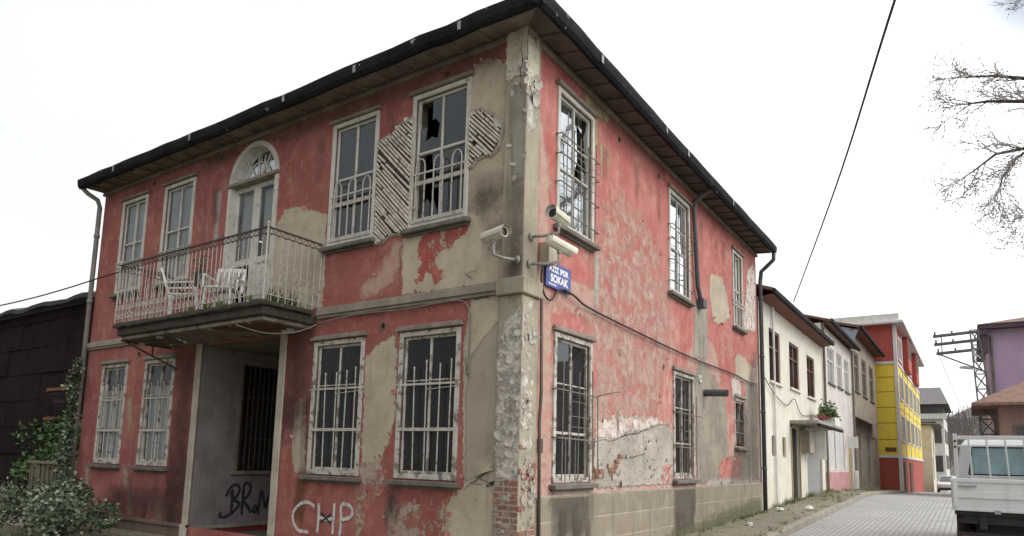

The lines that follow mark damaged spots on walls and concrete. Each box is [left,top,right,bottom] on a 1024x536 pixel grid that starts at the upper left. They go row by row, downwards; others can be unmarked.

flaking render [272,205,328,309]
flaking render [353,333,399,536]
flaking render [361,26,551,299]
peeling [382,199,674,536]
crack [599,409,664,475]
flaking render [709,273,731,326]